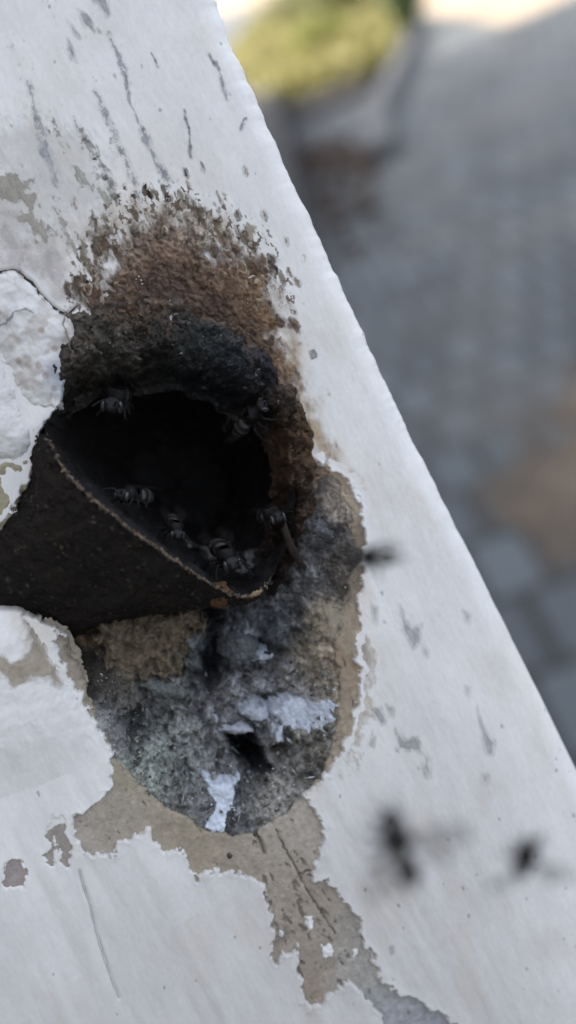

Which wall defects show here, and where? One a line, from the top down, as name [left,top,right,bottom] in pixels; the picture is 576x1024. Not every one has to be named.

peeling [0,173,78,252]
water stain [64,39,301,402]
crack [0,269,78,356]
spalling [42,462,456,1024]
peeling [2,859,28,887]